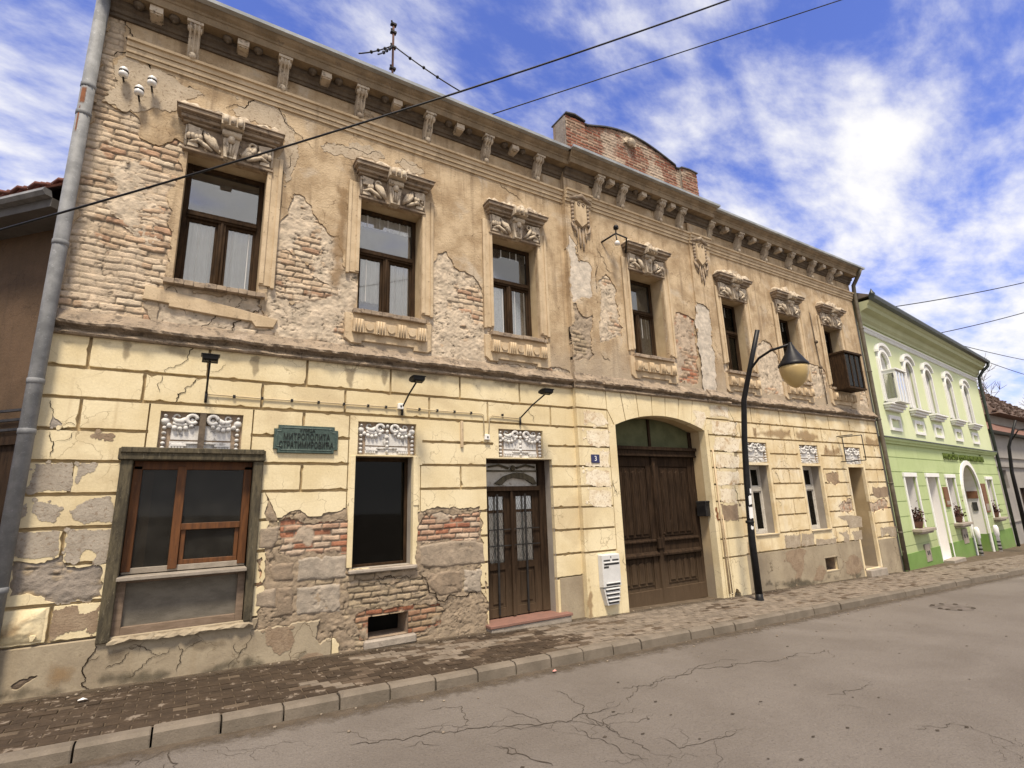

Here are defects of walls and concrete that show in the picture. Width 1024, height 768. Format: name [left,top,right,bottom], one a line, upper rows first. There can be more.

flaking render [58,16,364,347]
crack [157,287,262,403]
spalling [425,235,622,373]
spalling [672,303,742,521]
spalling [9,460,114,641]
spalling [253,494,489,659]
crack [81,640,202,689]